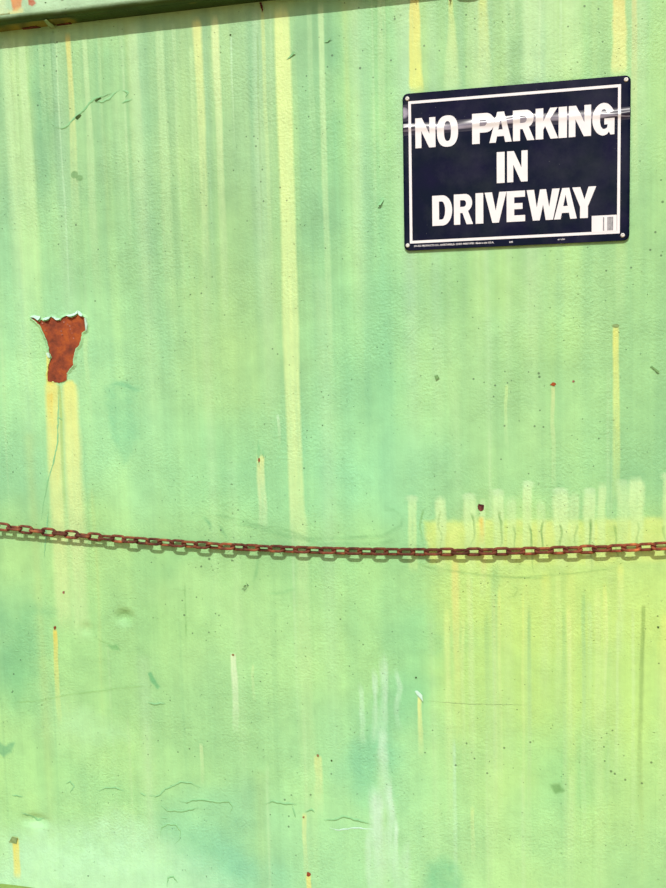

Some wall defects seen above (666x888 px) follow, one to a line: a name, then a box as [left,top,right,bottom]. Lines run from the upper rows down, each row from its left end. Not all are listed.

crack [58,90,131,130]
peeling [29,310,90,384]
crack [41,384,62,555]
damp [403,471,666,888]
crack [99,781,233,813]
crack [268,800,372,825]